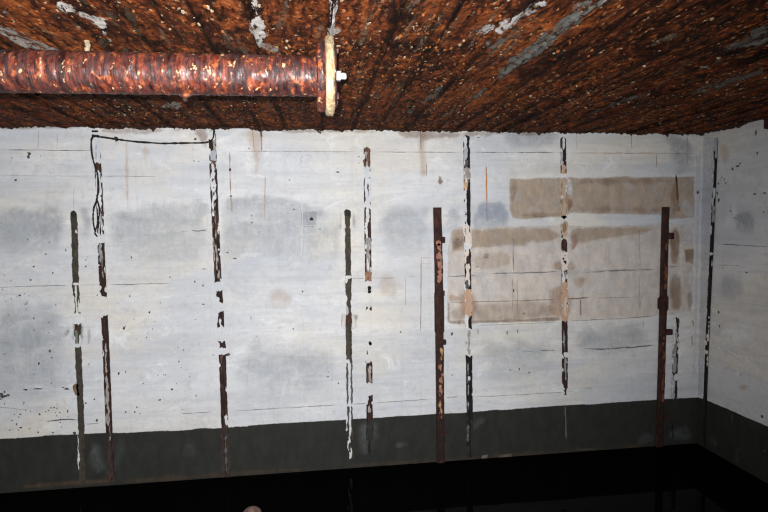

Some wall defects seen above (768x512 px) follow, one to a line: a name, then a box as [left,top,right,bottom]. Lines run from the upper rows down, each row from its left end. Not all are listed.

corrosion [67,125,357,147]
corrosion [373,117,766,158]
peeling [364,178,372,294]
peeling [463,136,480,408]
peeling [560,173,569,323]
water stain [448,177,694,324]
peeling [338,359,353,459]
peeling [364,335,374,413]
peeling [672,318,681,383]